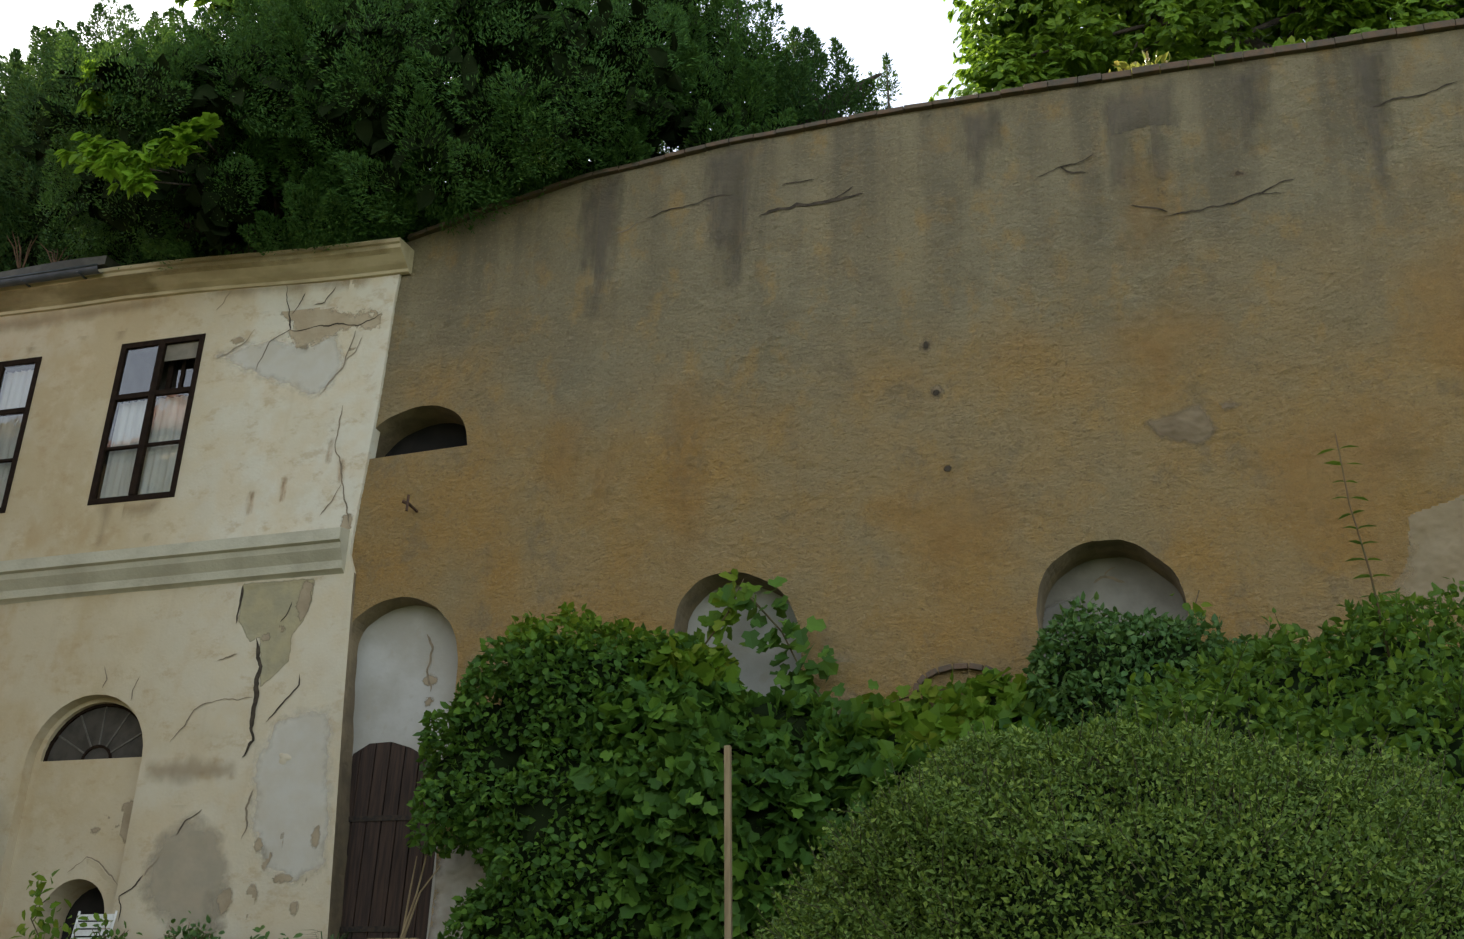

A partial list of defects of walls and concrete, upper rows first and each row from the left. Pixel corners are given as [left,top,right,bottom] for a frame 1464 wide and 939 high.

crack [607,194,728,237]
crack [759,179,862,216]
crack [1131,179,1294,216]
spalling [281,307,382,349]
crack [218,287,380,527]
spalling [1402,495,1464,603]
spalling [231,579,314,686]
crack [171,638,300,839]
crack [33,810,201,921]